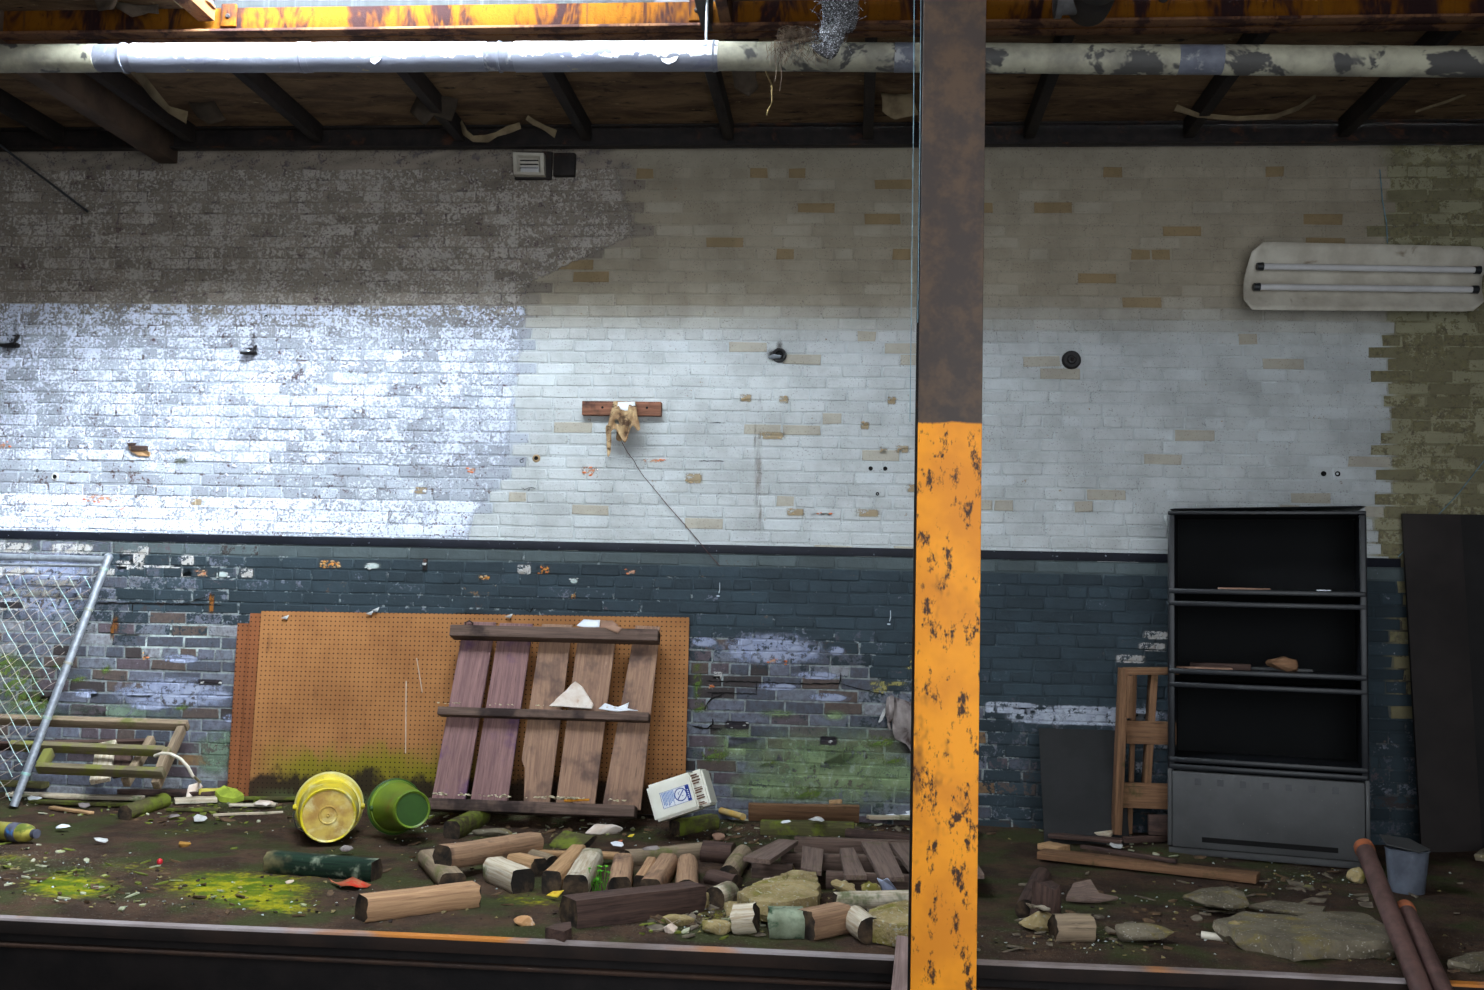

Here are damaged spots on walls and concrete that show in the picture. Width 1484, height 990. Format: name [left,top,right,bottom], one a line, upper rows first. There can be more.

peeling [0,169,633,617]